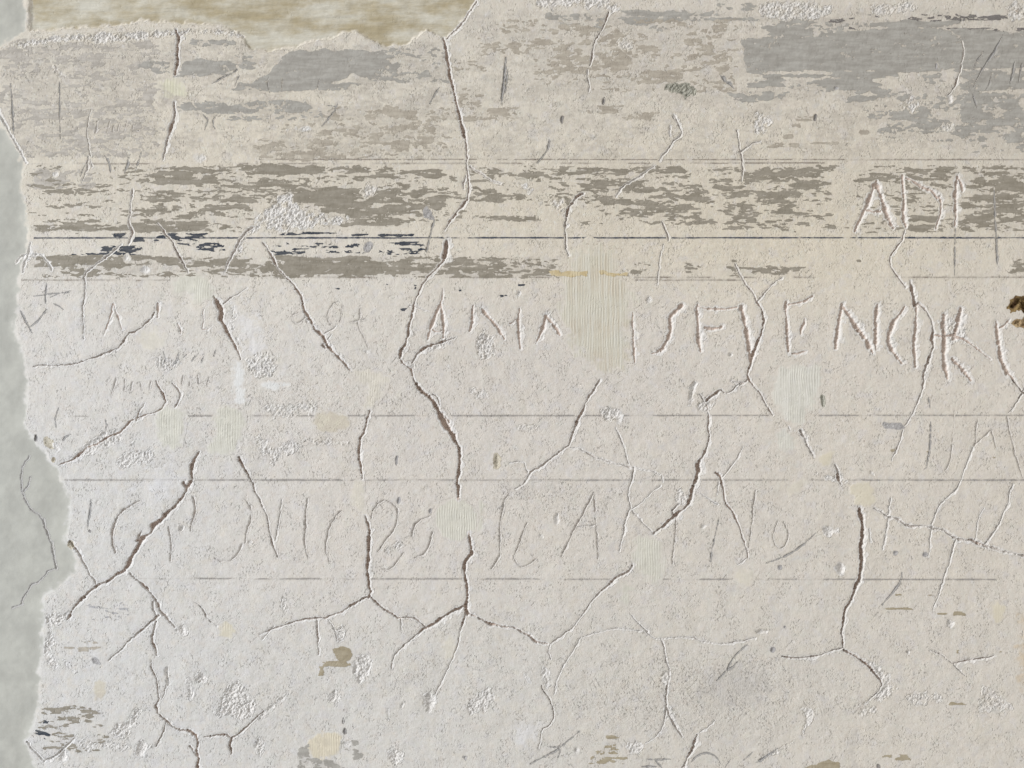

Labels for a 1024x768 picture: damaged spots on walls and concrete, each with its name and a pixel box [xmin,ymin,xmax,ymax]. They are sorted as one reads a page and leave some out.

flaking render [34,434,61,463]
crack [32,187,190,370]
crack [58,379,184,466]
crack [11,450,266,768]
crack [161,101,180,162]
crack [236,454,284,559]
crack [211,225,352,372]
crack [397,0,503,503]
peeling [0,0,1024,297]
crack [258,262,843,768]
crack [780,446,1024,702]
crack [888,229,939,462]